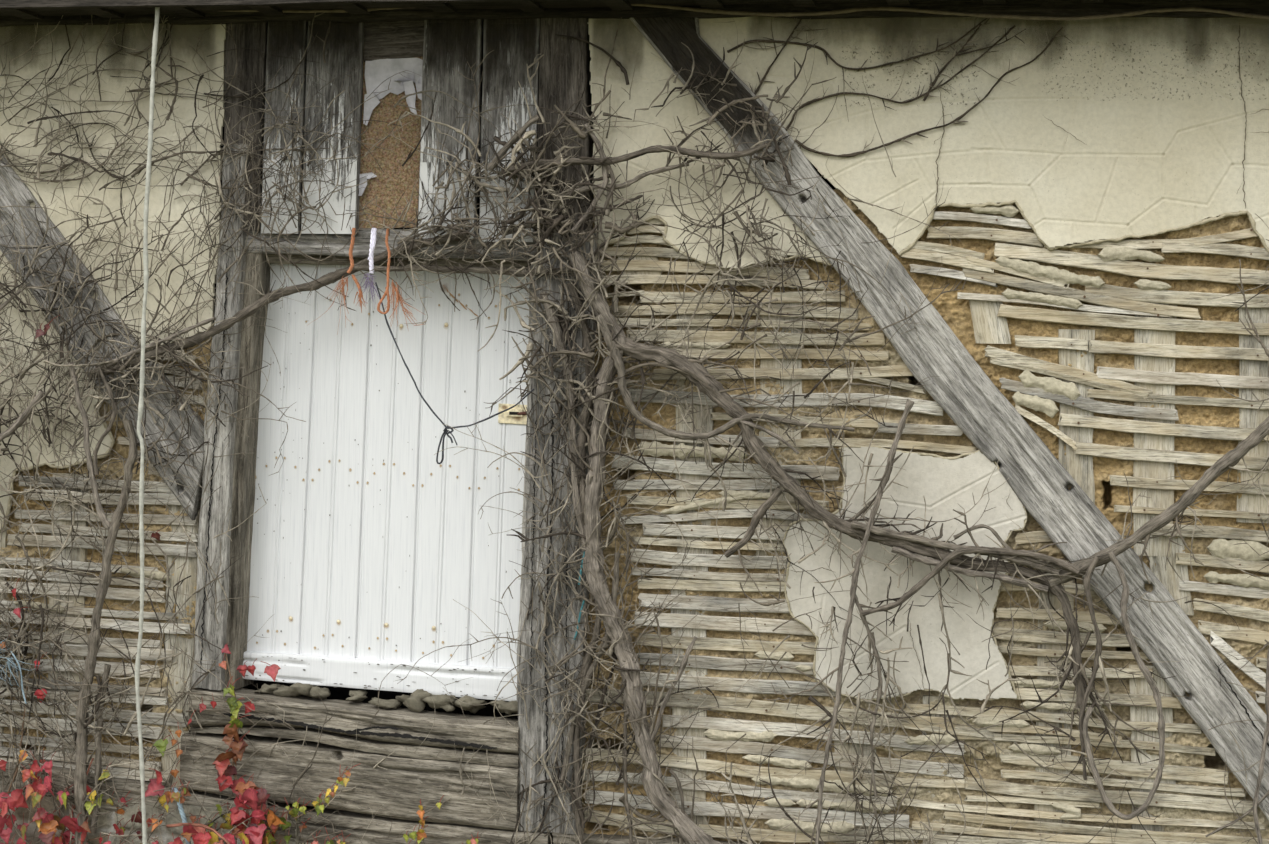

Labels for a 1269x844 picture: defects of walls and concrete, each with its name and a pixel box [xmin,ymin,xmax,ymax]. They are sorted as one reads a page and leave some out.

spalling [899,200,1269,262]
spalling [995,256,1105,309]
spalling [658,341,731,349]
spalling [1012,370,1081,418]
spalling [635,441,747,461]
spalling [660,490,770,514]
spalling [1204,538,1269,590]
spalling [754,504,1107,728]
spalling [904,734,956,746]
spalling [1008,743,1061,755]
spalling [703,729,892,844]
spalling [1049,802,1081,821]